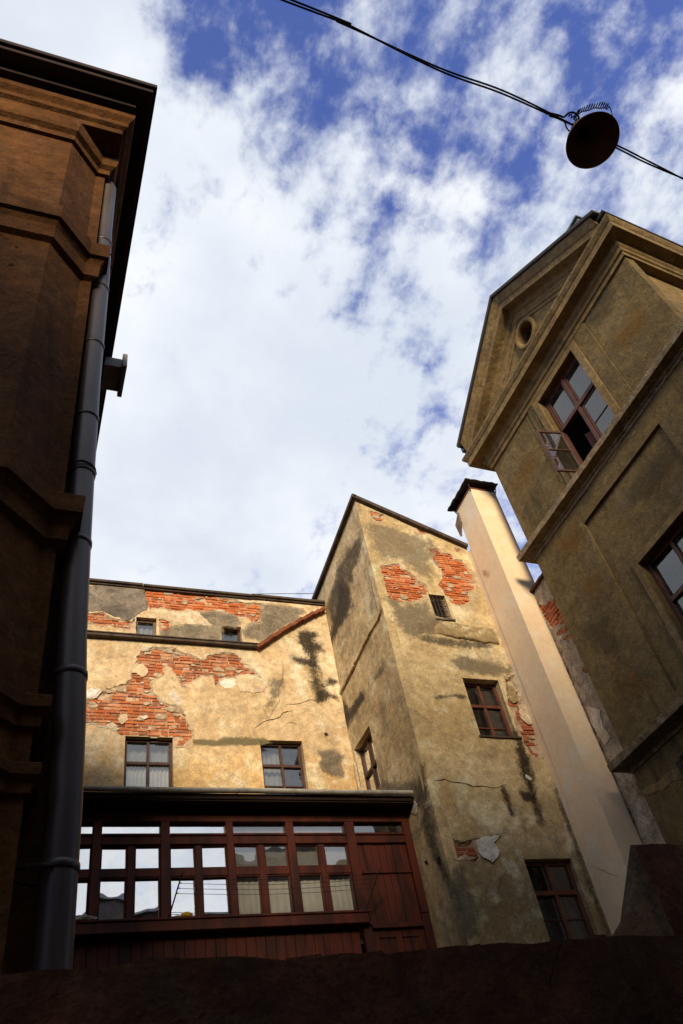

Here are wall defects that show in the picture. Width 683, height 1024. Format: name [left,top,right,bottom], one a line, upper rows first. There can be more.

spalling [375,547,477,606]
spalling [88,591,262,633]
spalling [539,597,572,645]
spalling [86,646,262,749]
crack [255,658,358,728]
spalling [495,674,545,759]
spalling [424,834,501,865]